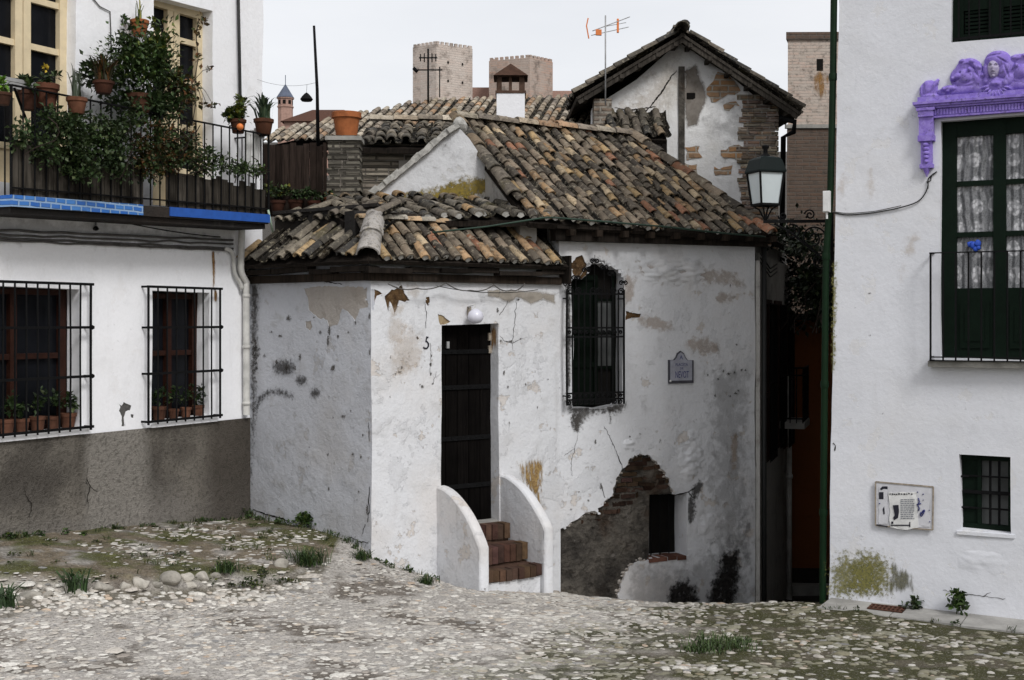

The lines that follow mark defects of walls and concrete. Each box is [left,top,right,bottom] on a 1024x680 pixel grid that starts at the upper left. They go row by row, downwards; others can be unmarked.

peeling [685,66,750,126]
peeling [685,146,702,173]
peeling [714,145,749,176]
spalling [572,255,589,279]
peeling [304,286,409,345]
leakage [273,360,320,398]
spalling [561,453,676,598]
leakage [887,565,913,592]